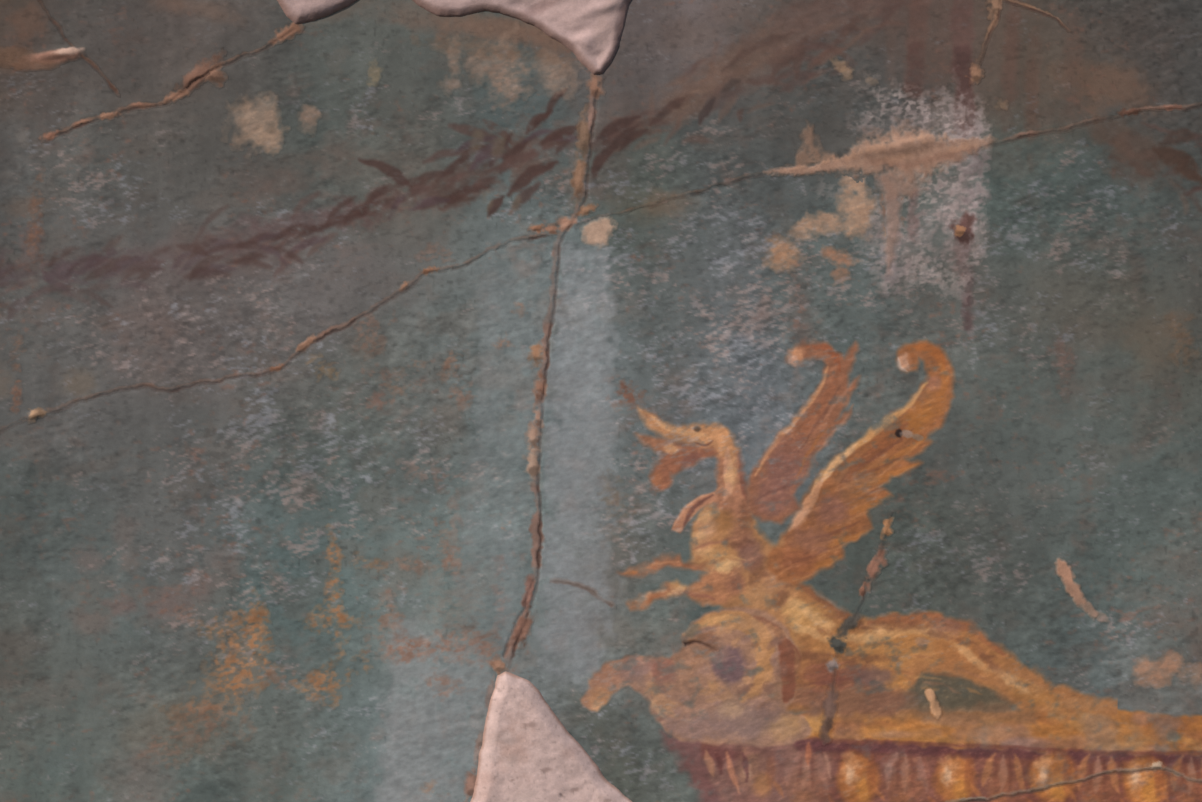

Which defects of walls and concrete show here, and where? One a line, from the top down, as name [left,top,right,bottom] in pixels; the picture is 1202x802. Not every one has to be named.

crack [37,0,305,143]
crack [964,0,1072,87]
crack [992,101,1202,147]
peeling [760,172,881,289]
crack [0,73,794,676]
crack [817,506,896,746]
peeling [484,673,496,711]
peeling [462,729,484,802]
crack [942,759,1202,802]